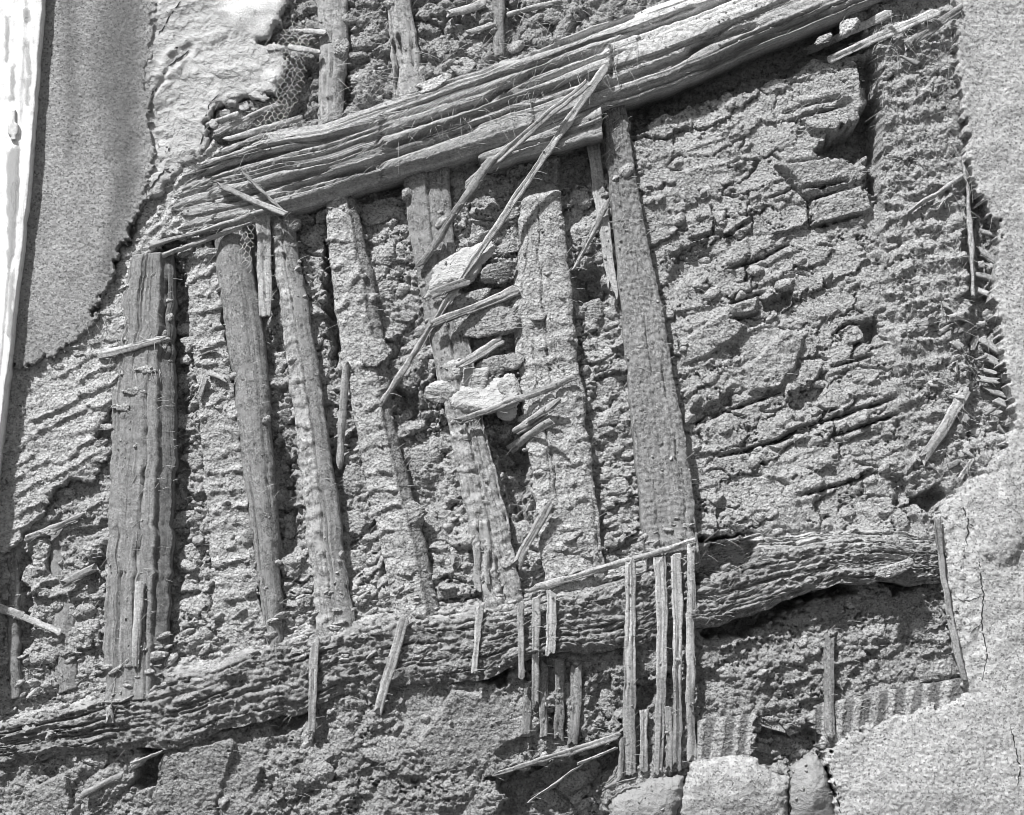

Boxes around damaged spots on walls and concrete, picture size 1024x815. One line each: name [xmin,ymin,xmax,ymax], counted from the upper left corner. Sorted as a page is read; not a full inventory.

spalling [815,17,861,45]
peeling [5,16,31,105]
spalling [209,75,276,129]
peeling [6,146,19,337]
crack [692,216,747,242]
crack [726,246,787,321]
crack [831,324,863,367]
crack [690,392,781,425]
crack [718,397,900,465]
spalling [36,456,108,504]
spalling [23,515,57,536]
crack [958,507,988,681]